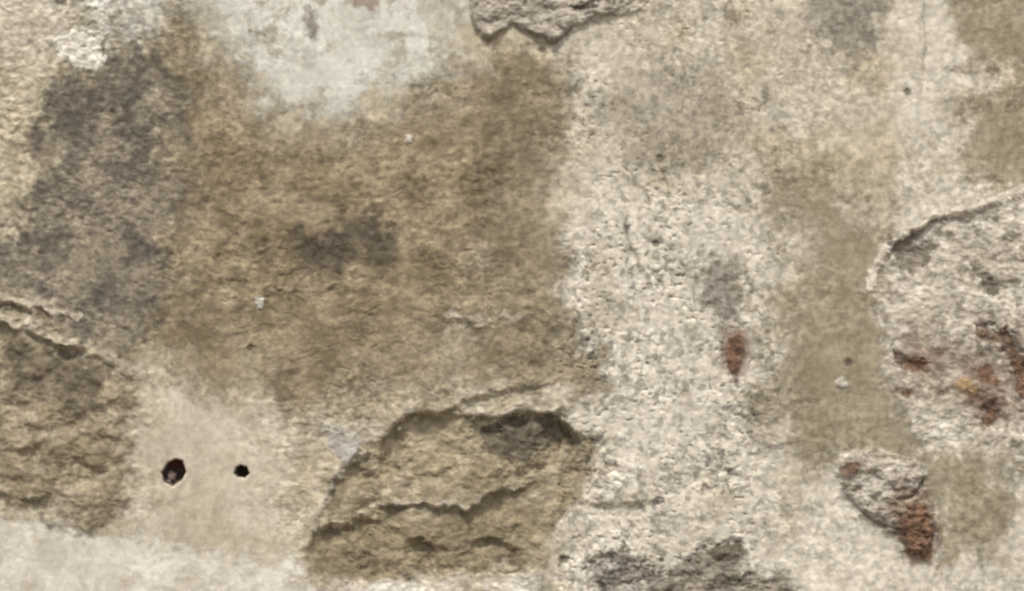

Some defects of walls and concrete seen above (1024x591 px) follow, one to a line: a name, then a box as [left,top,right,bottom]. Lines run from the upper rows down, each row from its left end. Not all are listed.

peeling [46,0,638,128]
water stain [0,13,613,415]
corrosion [726,332,744,375]
water stain [743,163,1024,569]
corrosion [893,351,927,371]
spalling [861,187,1024,465]
corrosion [955,364,1000,426]
corrosion [976,323,1024,398]
spalling [0,407,662,591]